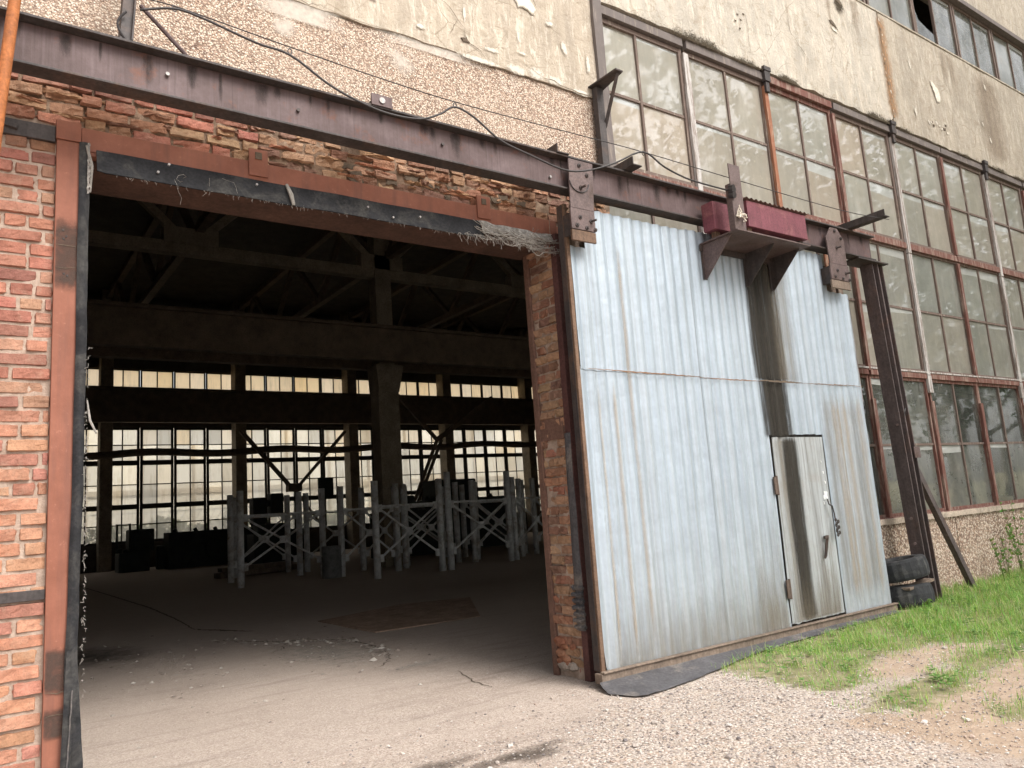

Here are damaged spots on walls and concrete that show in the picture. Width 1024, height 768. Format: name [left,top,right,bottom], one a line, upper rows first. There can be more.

peeling [515,0,536,15]
spalling [457,30,591,97]
leakage [741,263,817,620]